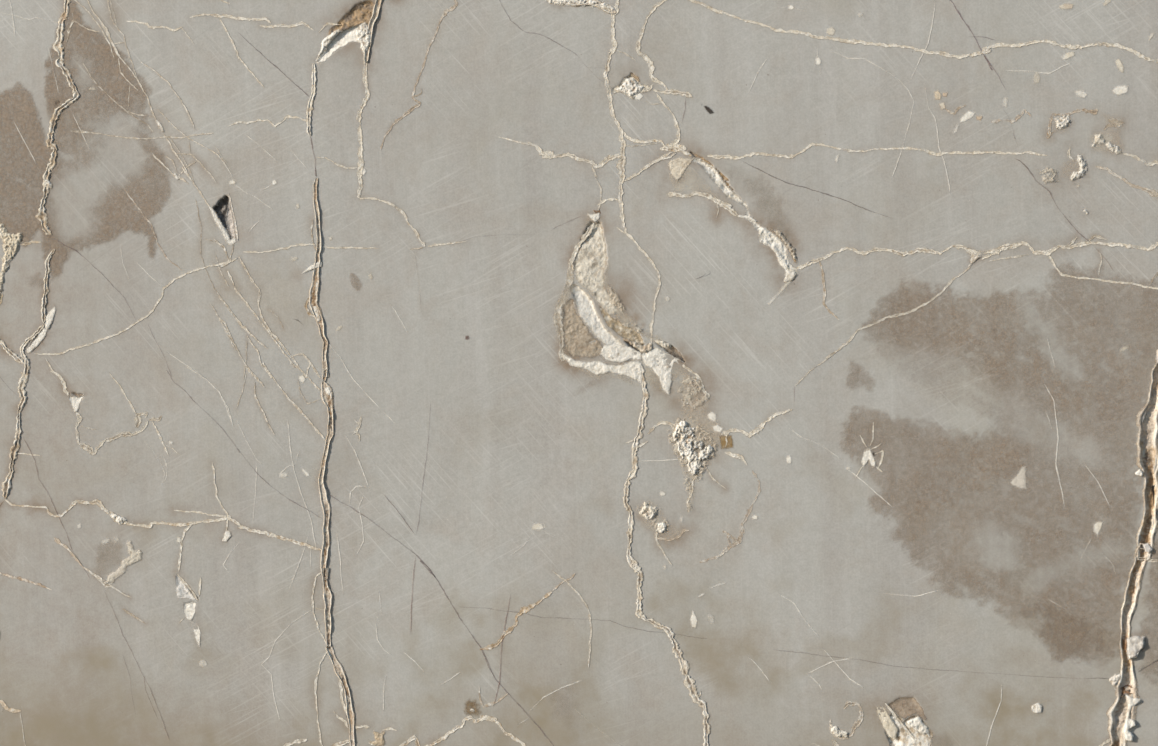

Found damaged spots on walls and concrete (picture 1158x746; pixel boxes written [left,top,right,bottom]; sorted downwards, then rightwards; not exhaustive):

spalling [316,0,383,63]
damp [0,3,165,304]
spalling [209,193,238,245]
spalling [656,146,797,304]
crack [0,0,592,746]
spalling [553,210,701,403]
crack [499,0,1158,746]
damp [881,293,1150,430]
spalling [648,417,726,512]
spalling [176,574,202,645]
spalling [877,698,933,746]